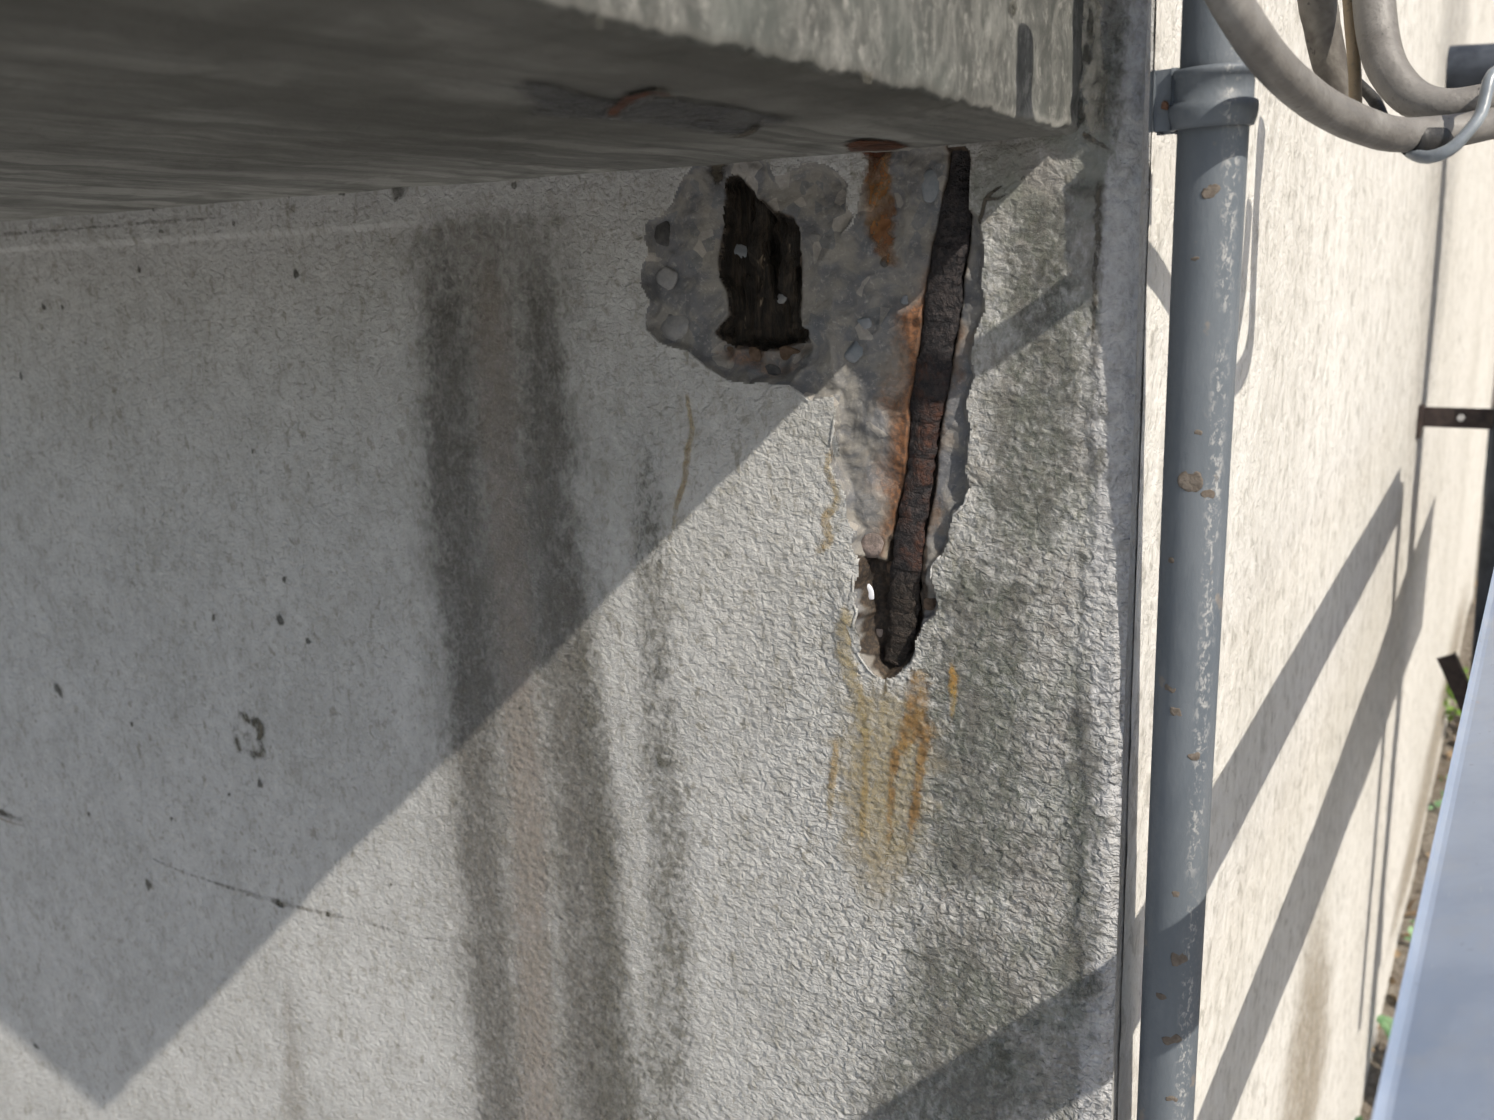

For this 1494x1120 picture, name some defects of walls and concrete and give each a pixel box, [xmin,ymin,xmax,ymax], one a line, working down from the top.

spalling [640,145,985,679]
rust [845,141,908,264]
leakage [428,286,687,1120]
rust [837,612,931,882]